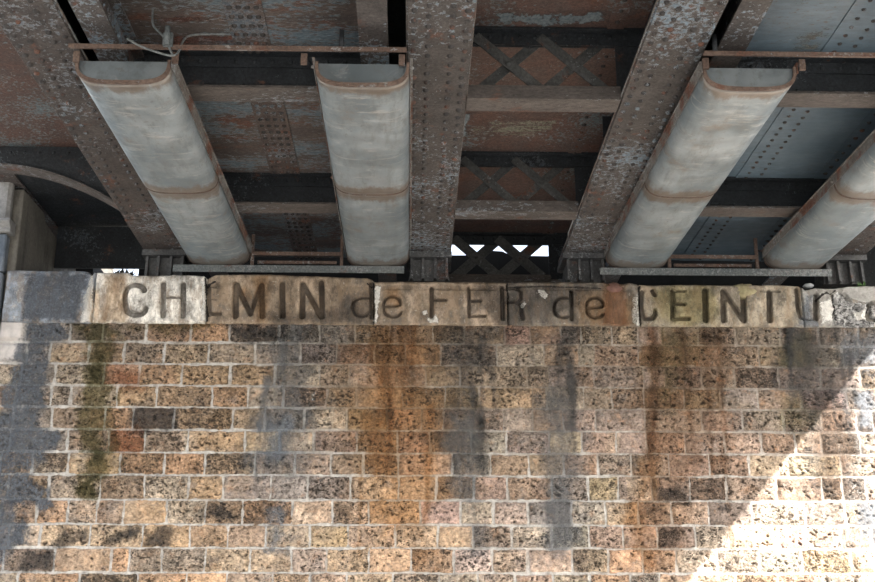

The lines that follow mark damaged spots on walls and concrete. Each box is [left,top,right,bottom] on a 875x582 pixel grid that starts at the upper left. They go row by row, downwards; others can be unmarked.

peeling [497,12,604,27]
rust [173,35,233,45]
spalling [819,292,875,328]